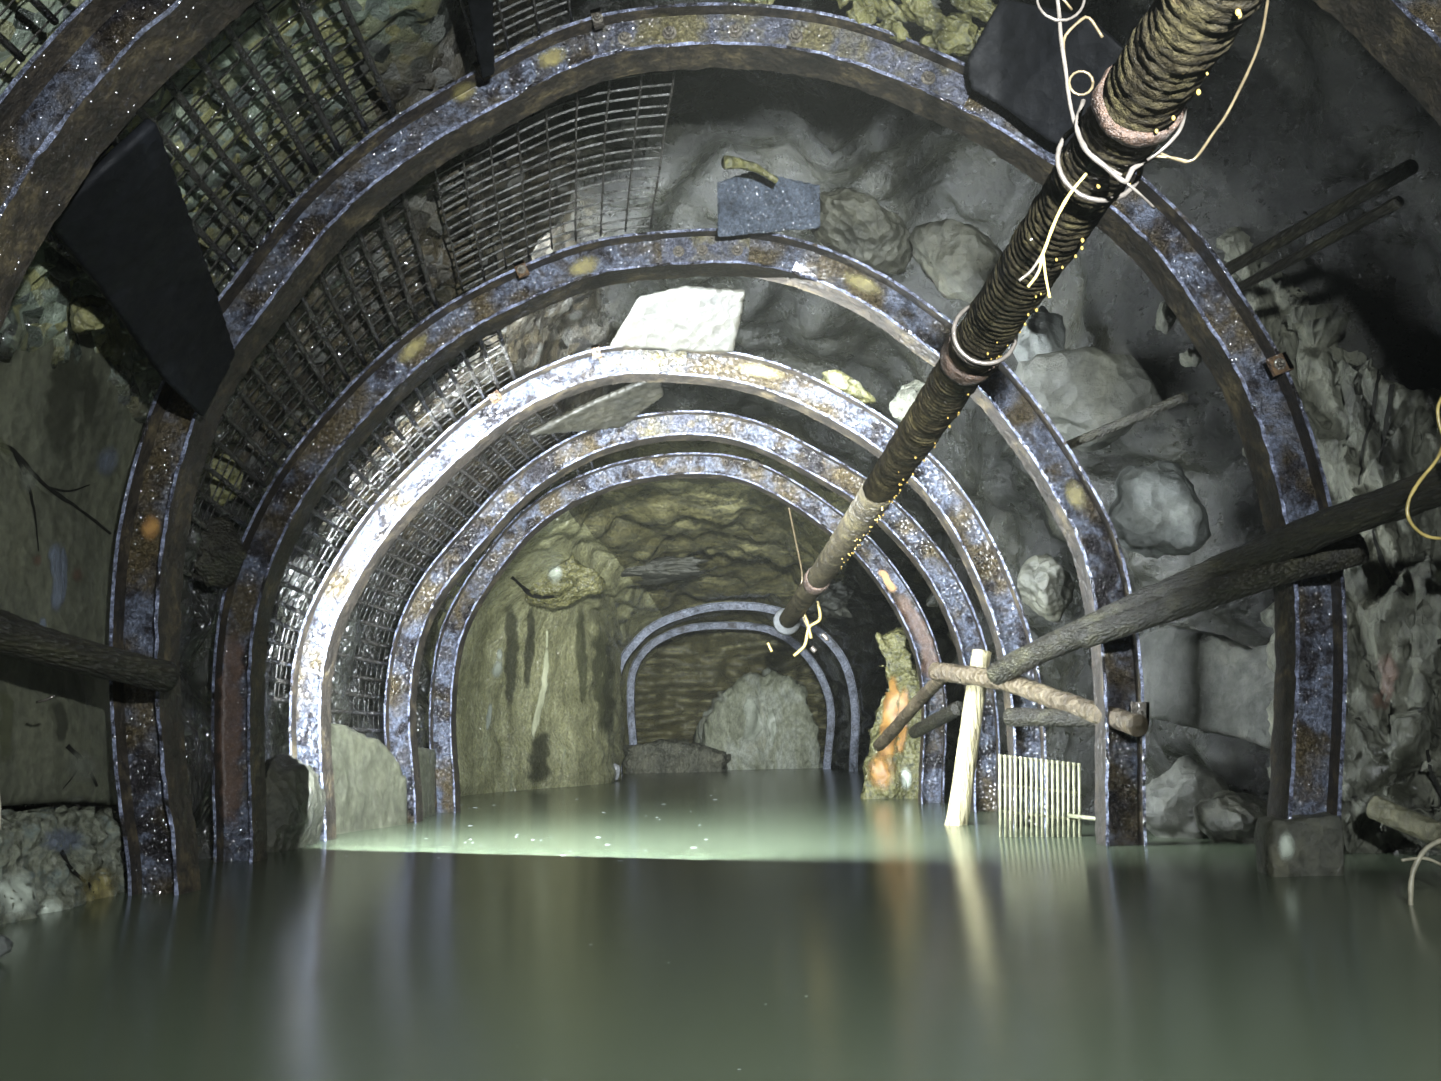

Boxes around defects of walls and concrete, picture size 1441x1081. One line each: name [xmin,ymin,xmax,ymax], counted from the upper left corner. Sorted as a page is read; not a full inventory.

crack [6,444,111,551]
corrosion [143,518,159,536]